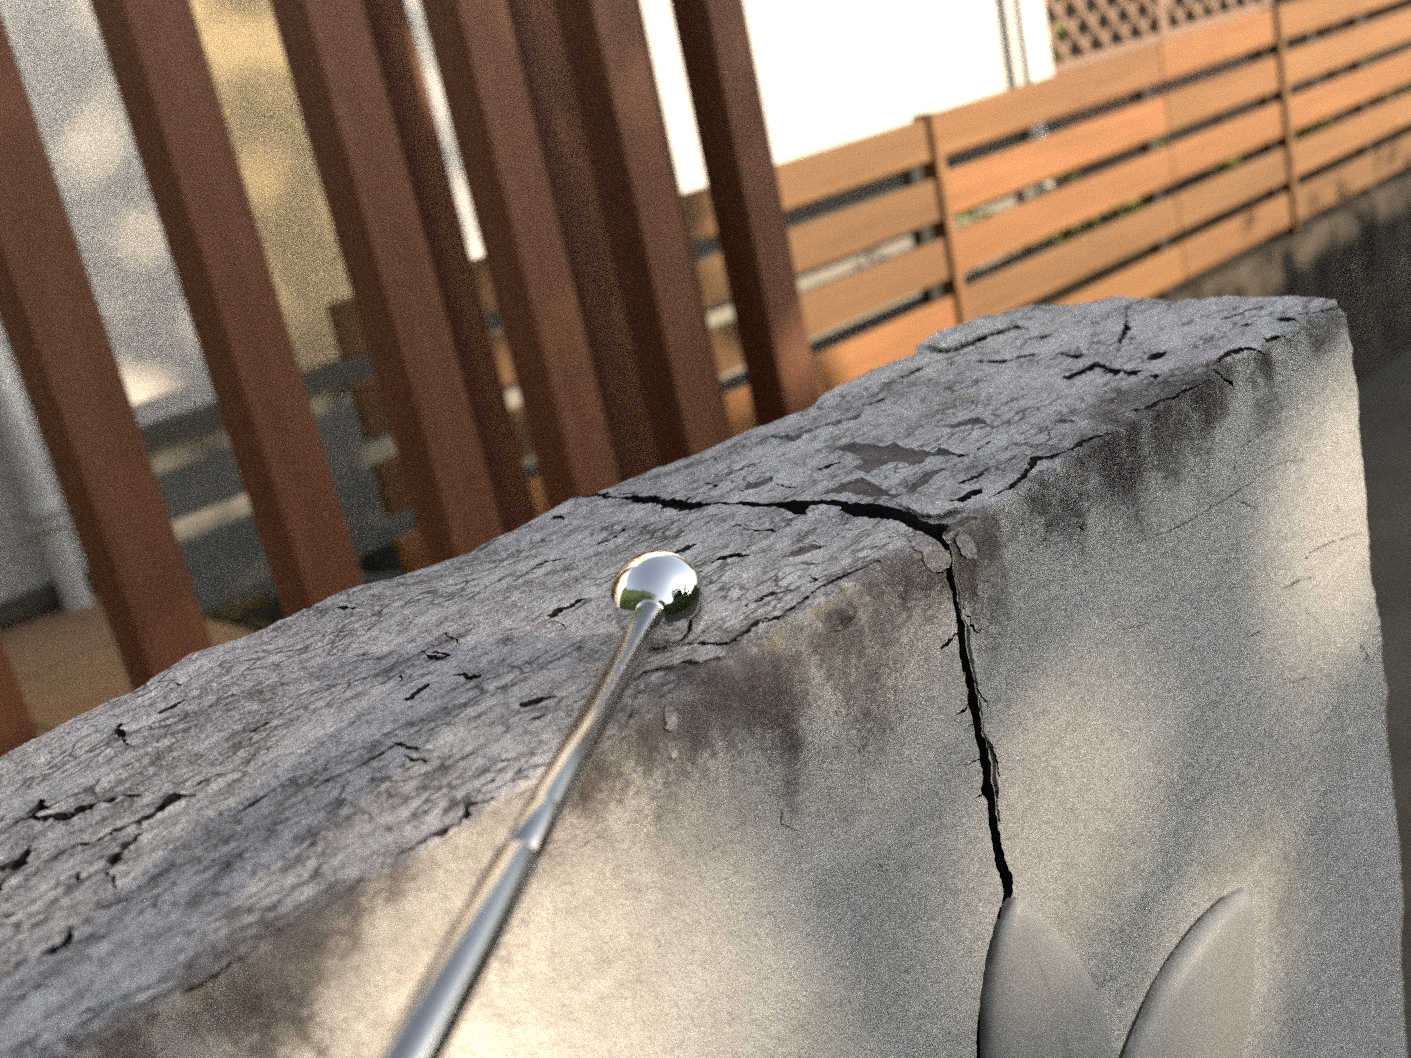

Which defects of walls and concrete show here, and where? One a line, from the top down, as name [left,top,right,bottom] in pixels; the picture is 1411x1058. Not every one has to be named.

leakage [1254,345,1275,414]
leakage [1029,361,1235,548]
crack [525,306,1338,919]
crack [114,682,185,745]
crack [398,632,488,701]
crack [518,695,556,723]
leakage [566,507,1010,817]
crack [228,742,429,816]
crack [396,757,519,855]
crack [0,774,220,956]
crack [69,944,260,1058]
crack [974,996,982,1058]